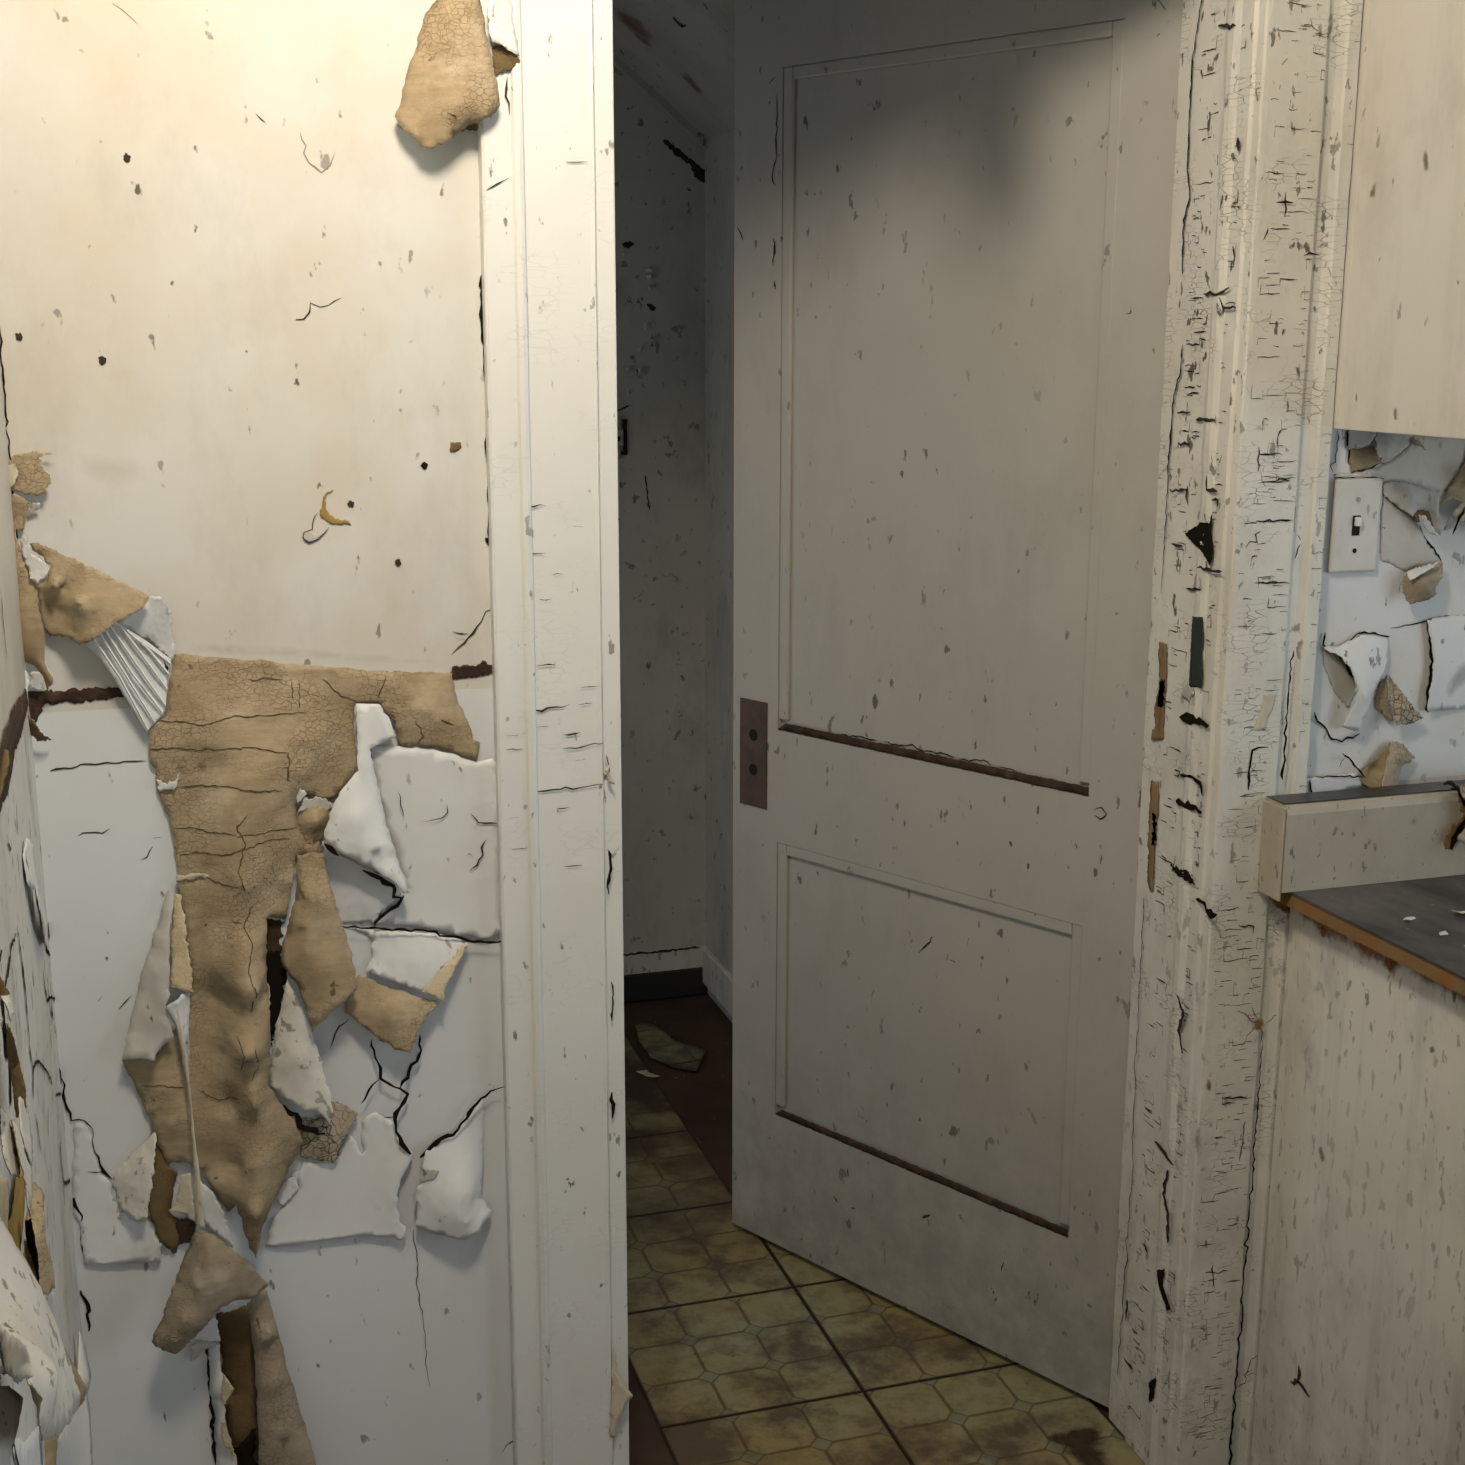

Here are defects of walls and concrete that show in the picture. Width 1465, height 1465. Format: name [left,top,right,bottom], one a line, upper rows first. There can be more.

peeling [1334,430,1465,604]
crack [1420,507,1465,560]
crack [1117,0,1448,1465]
peeling [1306,615,1465,793]
peeling [321,703,500,1002]
peeling [0,977,93,1465]
peeling [72,1121,162,1266]
peeling [122,885,194,1079]
peeling [270,979,334,1124]
crack [283,1105,325,1136]
peeling [265,1098,491,1247]
crack [330,1019,505,1158]